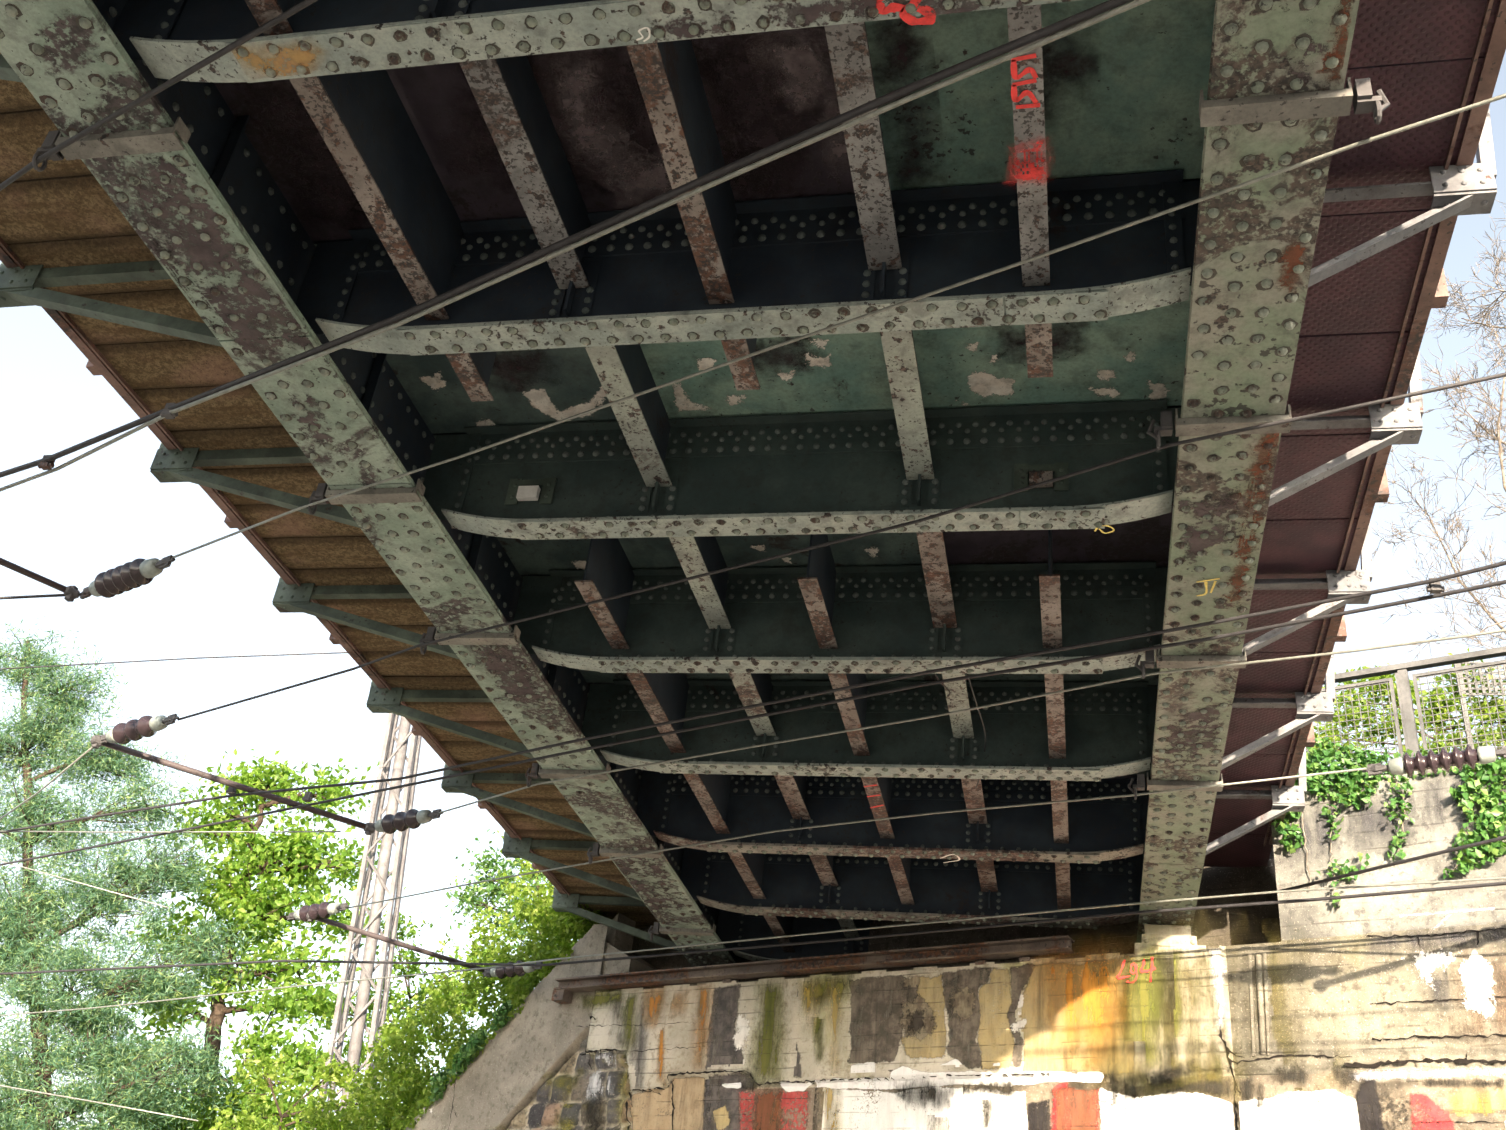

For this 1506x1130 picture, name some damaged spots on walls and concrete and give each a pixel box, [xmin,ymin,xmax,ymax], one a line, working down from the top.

peeling [522,386,607,421]
peeling [956,342,1015,406]
water stain [586,1001,645,1098]
water stain [793,1044,802,1078]
crack [580,1016,1103,1130]